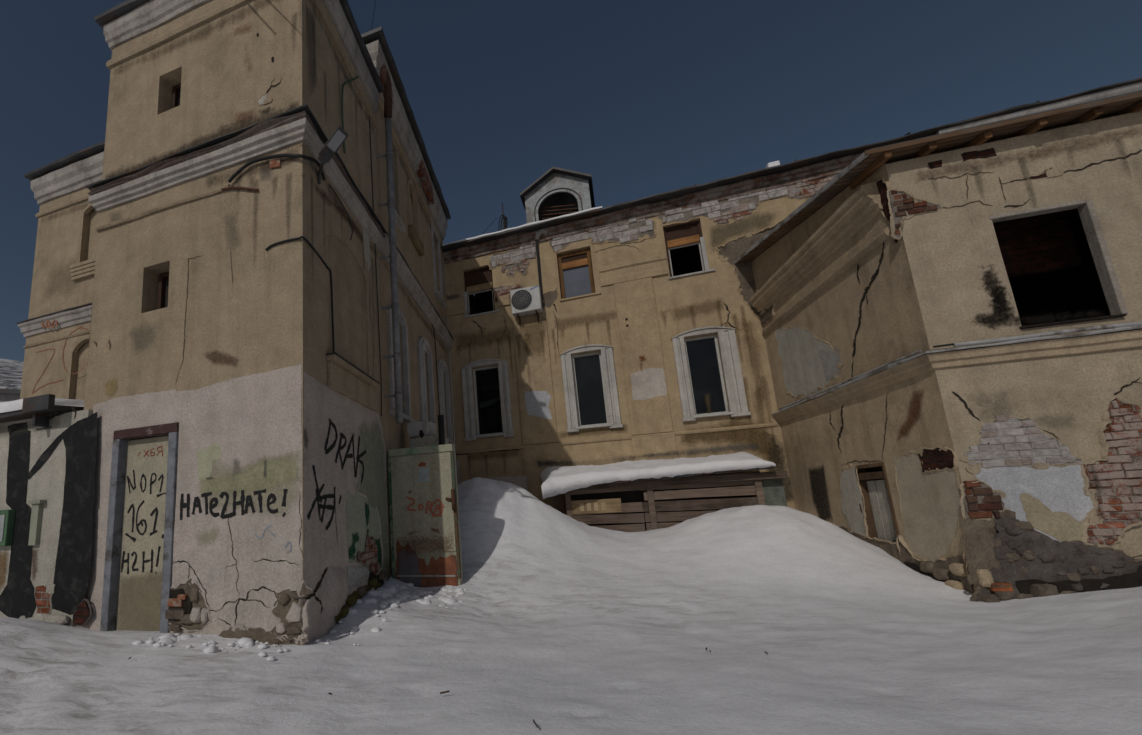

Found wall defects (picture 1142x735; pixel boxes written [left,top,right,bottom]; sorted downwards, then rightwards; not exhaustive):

crack [175,255,203,384]
flaking render [488,174,837,303]
peeling [715,221,843,398]
crack [851,242,884,378]
flaking render [876,177,943,245]
flaking render [961,148,997,162]
crack [928,150,1142,208]
water stain [976,264,1102,328]
crack [829,392,888,465]
flaking render [165,576,313,646]
crack [174,475,338,626]
flaking render [915,395,1142,602]